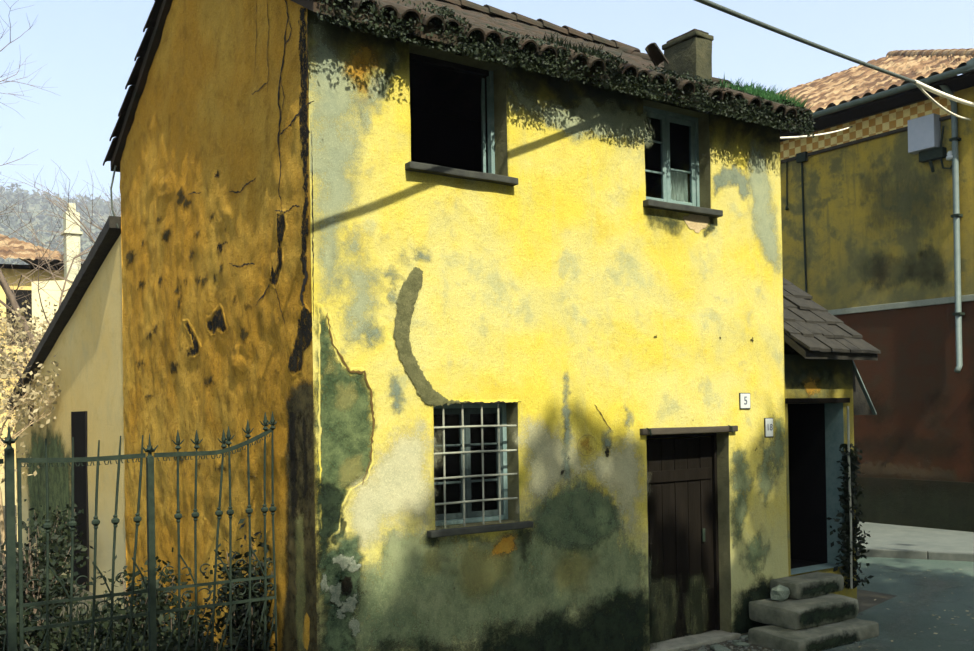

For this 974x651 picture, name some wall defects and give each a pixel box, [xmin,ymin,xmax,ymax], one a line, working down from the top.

peeling [346,46,377,91]
crack [252,0,314,321]
spalling [176,187,201,208]
leakage [864,250,945,286]
flaking render [175,208,652,651]
leakage [731,417,786,634]
leakage [380,591,657,651]